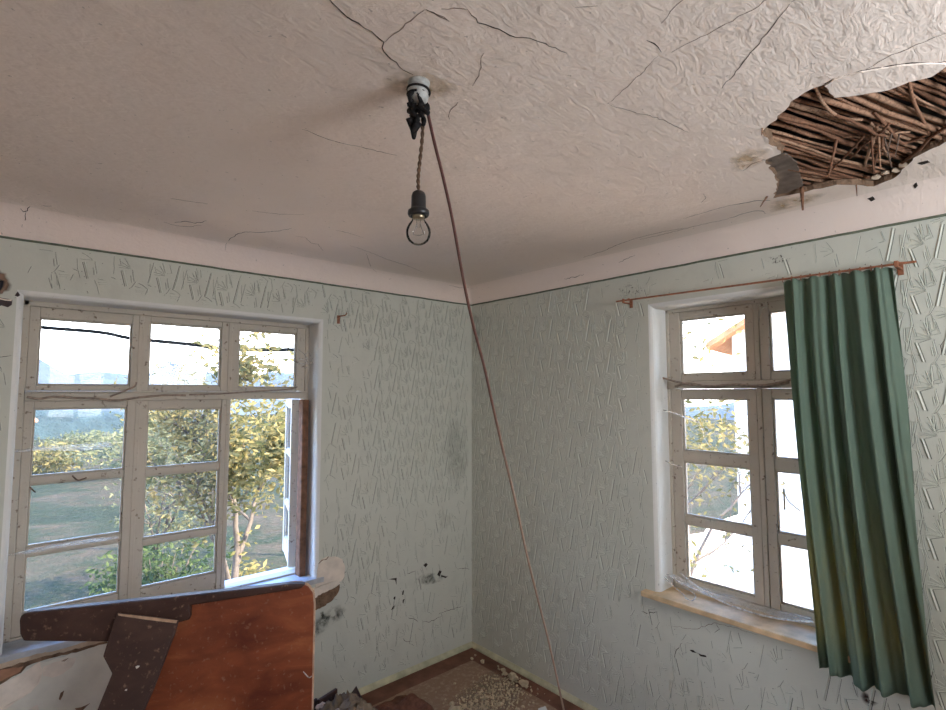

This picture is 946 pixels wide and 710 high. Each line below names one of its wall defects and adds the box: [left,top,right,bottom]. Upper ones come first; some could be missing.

crack [330,0,565,75]
crack [607,0,793,132]
spalling [765,134,946,201]
spalling [313,556,345,610]
peeling [0,641,112,710]